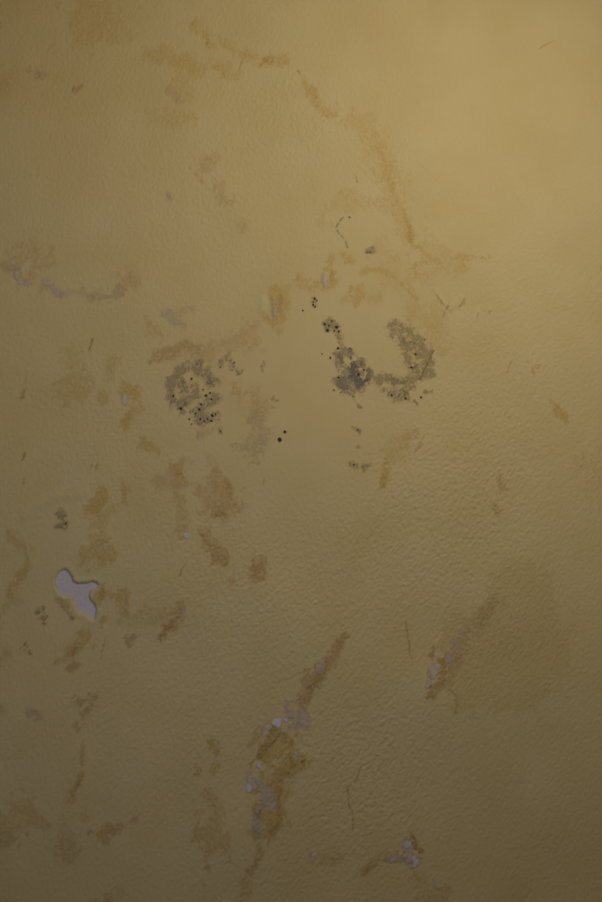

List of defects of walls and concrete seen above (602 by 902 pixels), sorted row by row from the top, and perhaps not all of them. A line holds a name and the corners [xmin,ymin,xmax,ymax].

damp [137,75,492,466]
peeling [56,570,98,620]